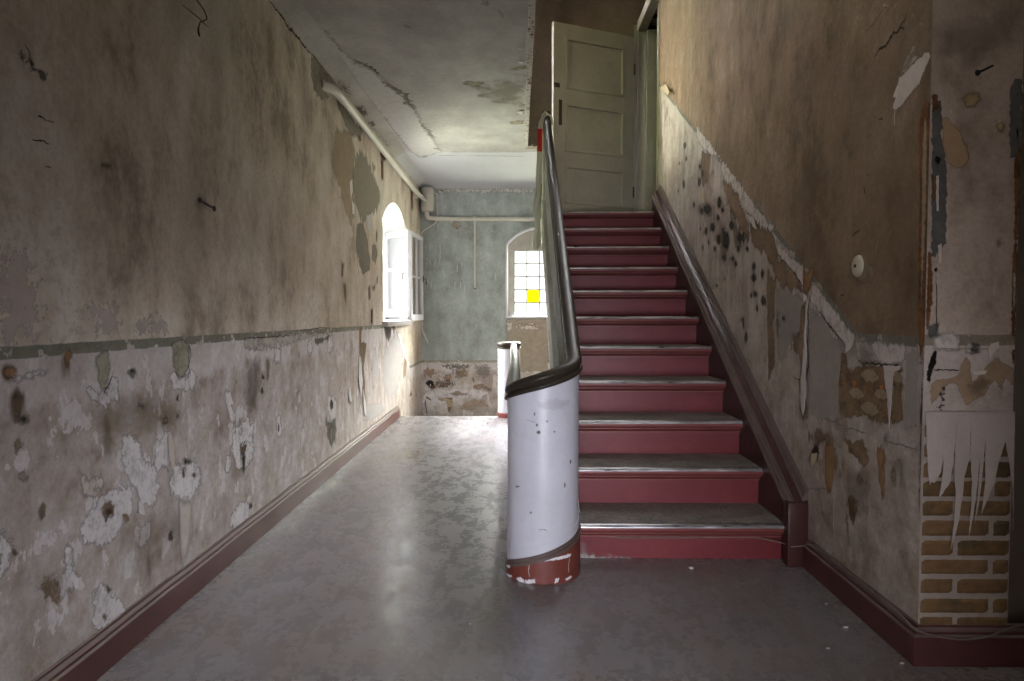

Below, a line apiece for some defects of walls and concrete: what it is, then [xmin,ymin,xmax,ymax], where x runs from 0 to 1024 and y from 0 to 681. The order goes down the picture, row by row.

crack [354,60,475,157]
peeling [332,129,377,240]
damp [693,198,749,268]
damp [750,263,766,312]
peeling [696,126,906,367]
spalling [225,391,255,473]
peeling [363,333,410,420]
peeling [409,379,490,416]
peeling [80,431,201,561]
peeling [230,501,252,528]
peeling [41,546,79,605]
peeling [92,583,125,630]